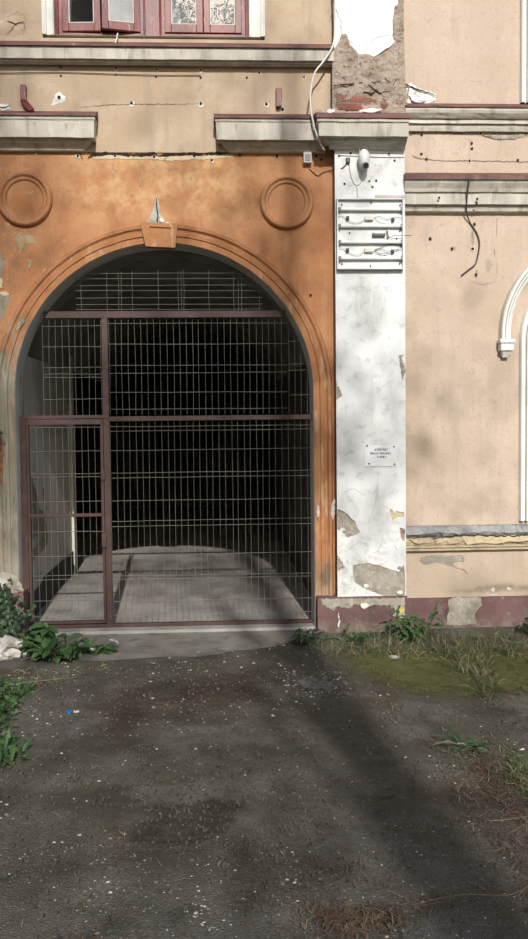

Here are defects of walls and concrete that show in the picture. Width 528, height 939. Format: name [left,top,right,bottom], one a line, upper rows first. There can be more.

flaking render [312,0,437,114]
peeling [0,244,10,320]
flaking render [0,572,43,593]
flaking render [321,555,406,627]
flaking render [446,597,486,626]